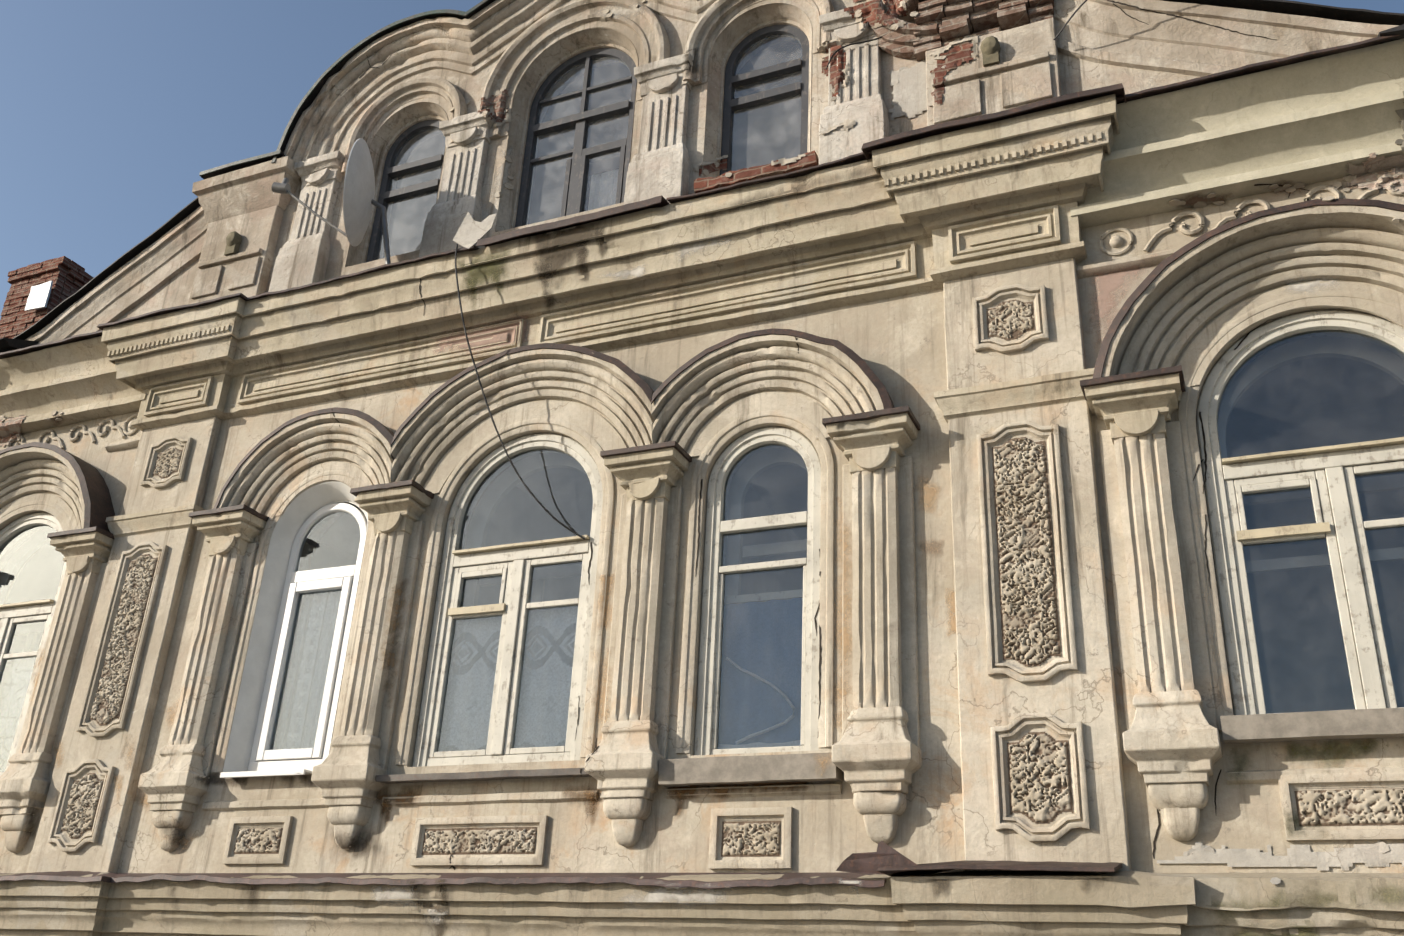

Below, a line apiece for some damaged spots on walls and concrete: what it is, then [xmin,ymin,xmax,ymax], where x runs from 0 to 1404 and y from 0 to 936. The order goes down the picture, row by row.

flaking render [600,0,646,22]
flaking render [844,0,919,31]
flaking render [818,38,851,101]
flaking render [924,34,979,107]
flaking render [693,155,732,177]
flaking render [771,154,805,166]
flaking render [1322,139,1404,201]
leakage [531,223,606,307]
crack [1193,412,1211,588]
crack [814,549,822,733]
flaking render [1157,840,1404,885]